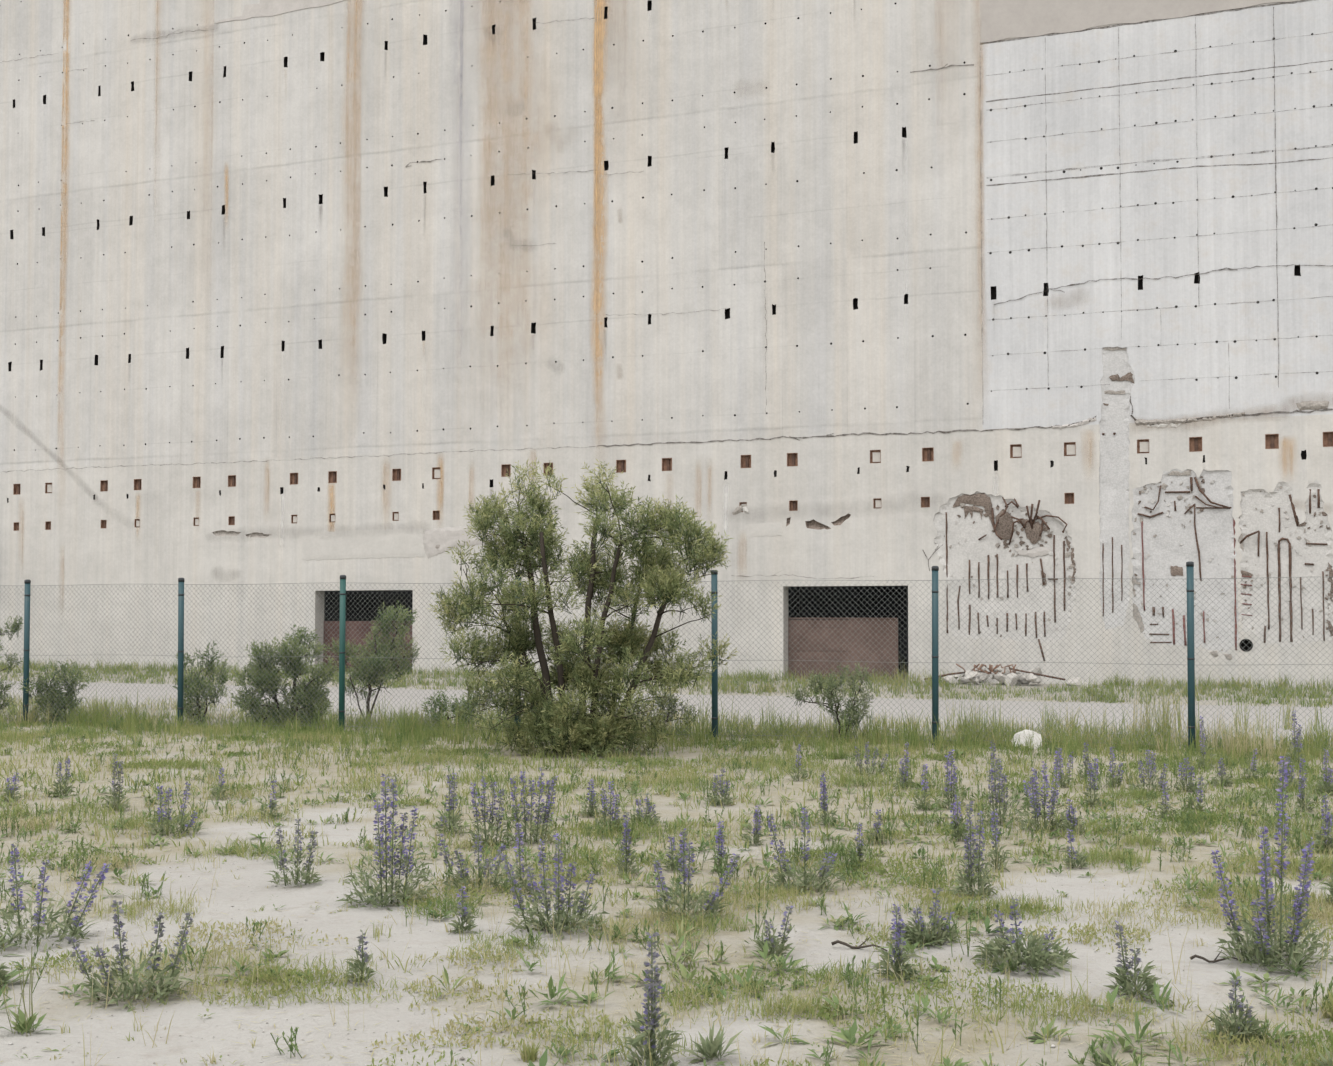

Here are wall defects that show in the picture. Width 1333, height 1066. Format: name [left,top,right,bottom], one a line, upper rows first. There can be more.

rust [593,0,605,356]
crack [994,264,1333,305]
spalling [1103,372,1134,406]
spalling [933,491,1078,661]
spalling [1102,469,1333,660]